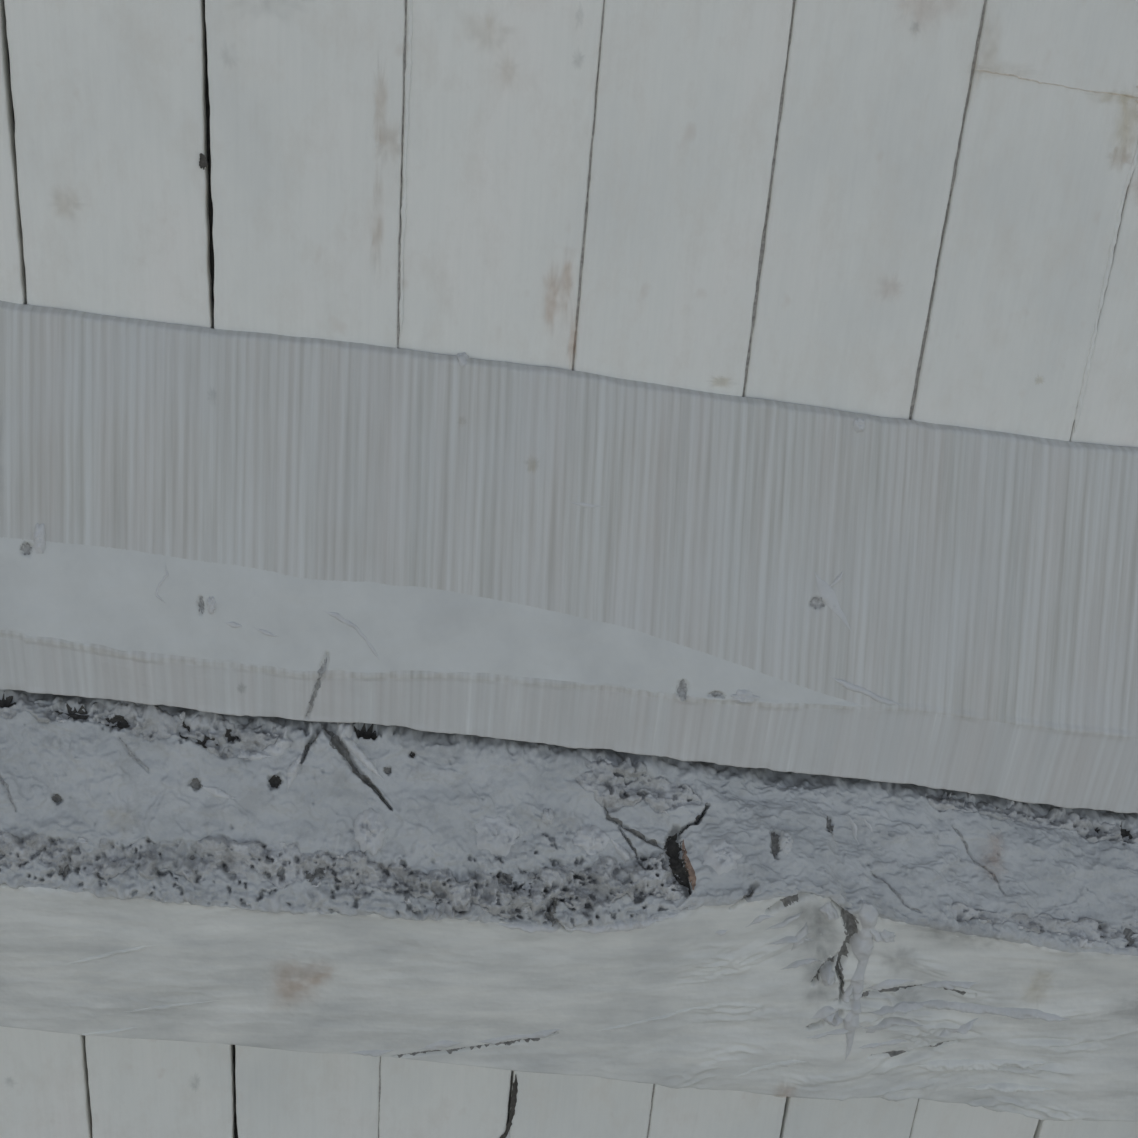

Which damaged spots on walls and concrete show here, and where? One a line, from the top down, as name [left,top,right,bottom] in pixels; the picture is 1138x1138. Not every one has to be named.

crack [976,70,1138,103]
spalling [0,693,279,761]
crack [301,657,391,809]
spalling [0,831,682,921]
spalling [575,756,702,814]
crack [604,803,707,895]
spalling [926,791,1138,844]
crack [812,907,966,997]
spalling [951,902,1138,943]
crack [886,1041,949,1057]